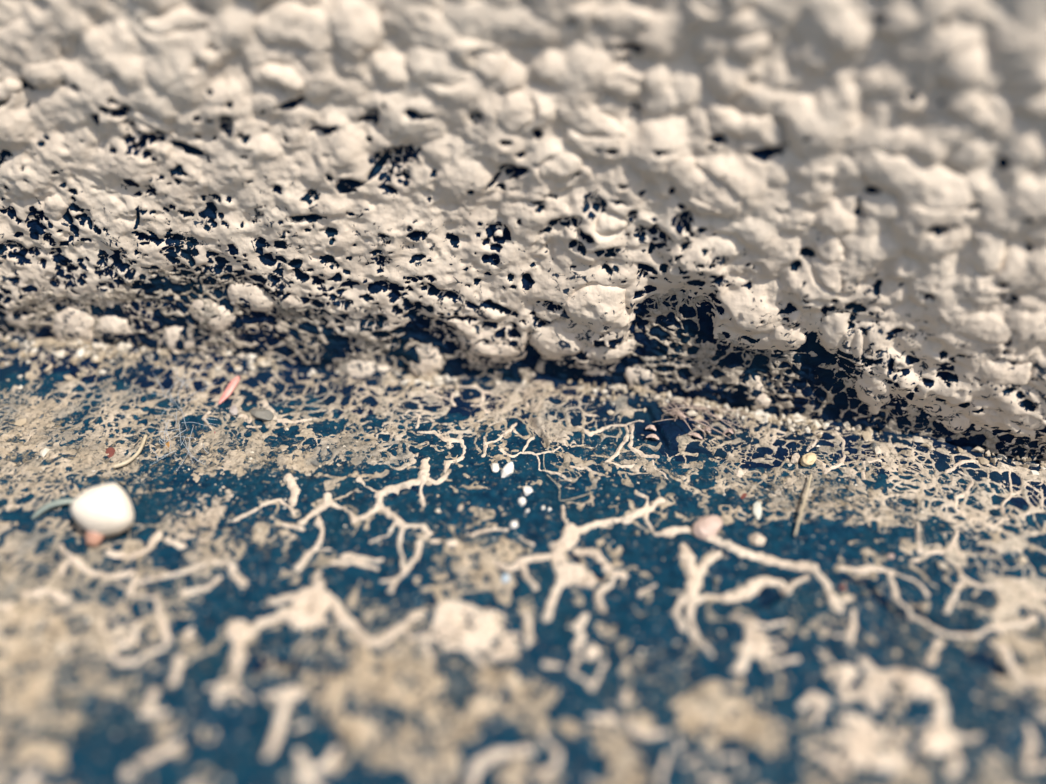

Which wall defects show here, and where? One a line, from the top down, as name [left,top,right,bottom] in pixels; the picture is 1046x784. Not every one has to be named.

peeling [19,79,38,109]
peeling [261,96,306,114]
peeling [403,109,434,121]
peeling [301,121,339,136]
peeling [327,103,422,195]
peeling [706,134,728,150]
peeling [746,142,789,162]
peeling [467,140,536,195]
peeling [997,156,1011,170]
peeling [0,165,1046,784]